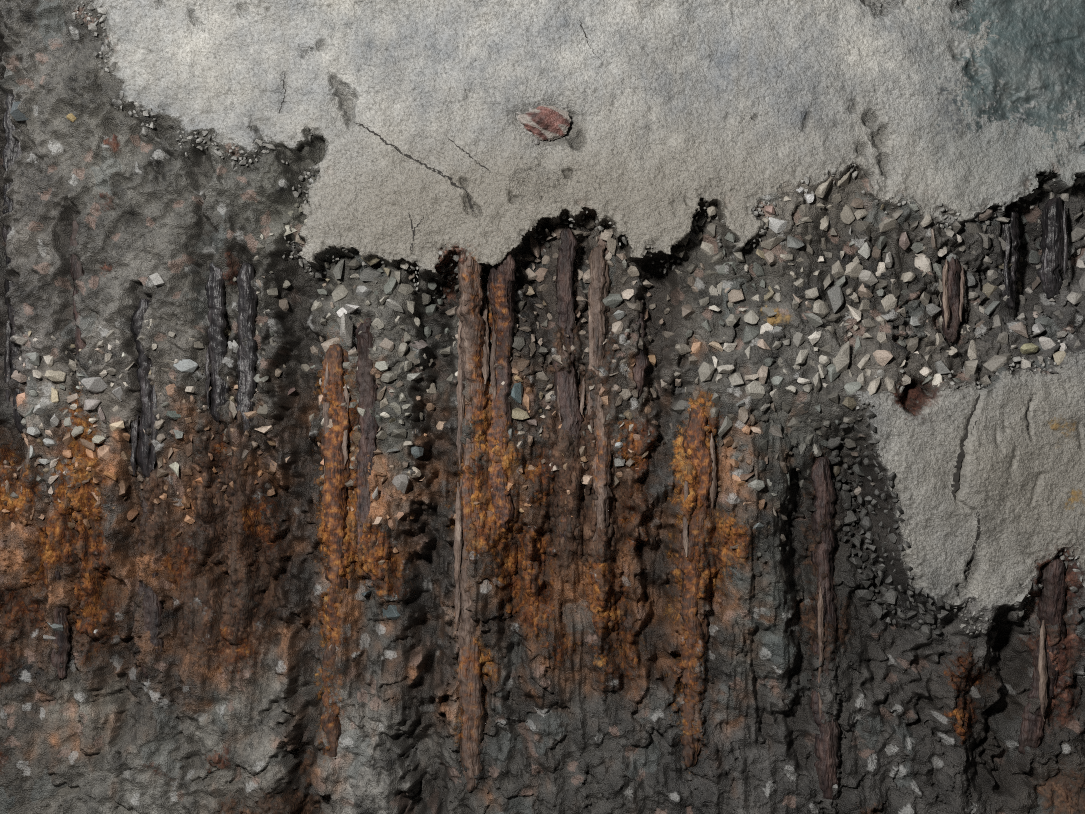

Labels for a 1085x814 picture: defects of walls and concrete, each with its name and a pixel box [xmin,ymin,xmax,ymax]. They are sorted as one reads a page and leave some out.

hole [329,75,360,133]
peeling [942,0,1085,169]
corrosion [436,245,475,299]
spalling [940,257,965,343]
spalling [1000,208,1021,309]
spalling [1037,197,1068,299]
corrosion [0,389,119,687]
corrosion [134,419,288,679]
corrosion [315,371,408,648]
corrosion [454,282,657,686]
corrosion [665,392,750,738]
spalling [1018,558,1070,754]